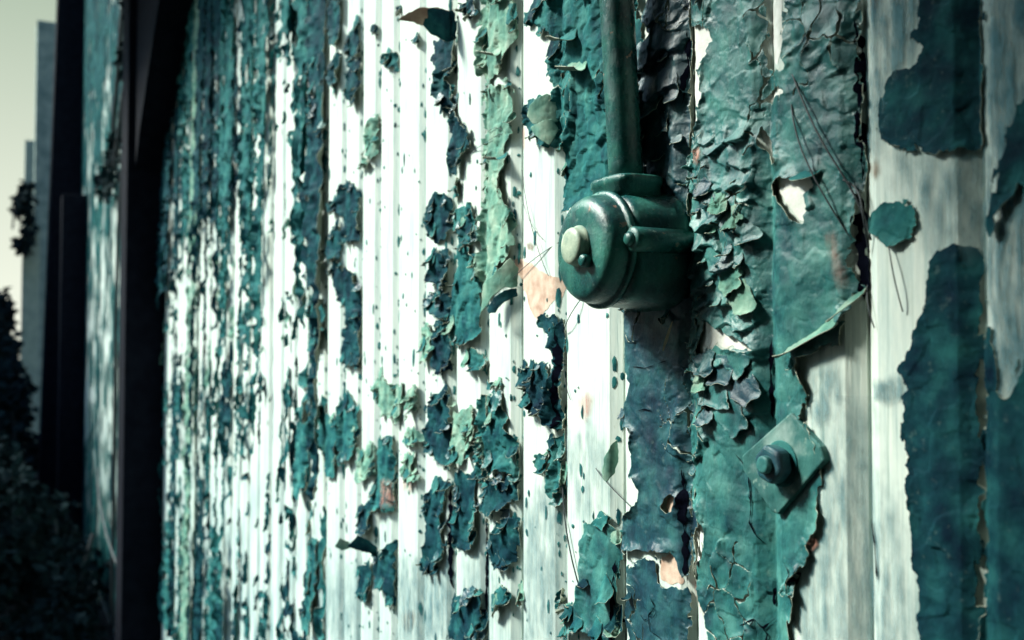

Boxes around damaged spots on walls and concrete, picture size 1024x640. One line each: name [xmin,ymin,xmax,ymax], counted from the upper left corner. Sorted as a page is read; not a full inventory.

peeling [876,0,986,155]
peeling [868,199,917,247]
peeling [985,99,1024,237]
peeling [155,0,609,640]
peeling [554,0,869,640]
crack [736,455,763,542]
peeling [897,243,1024,640]
crack [740,561,801,640]